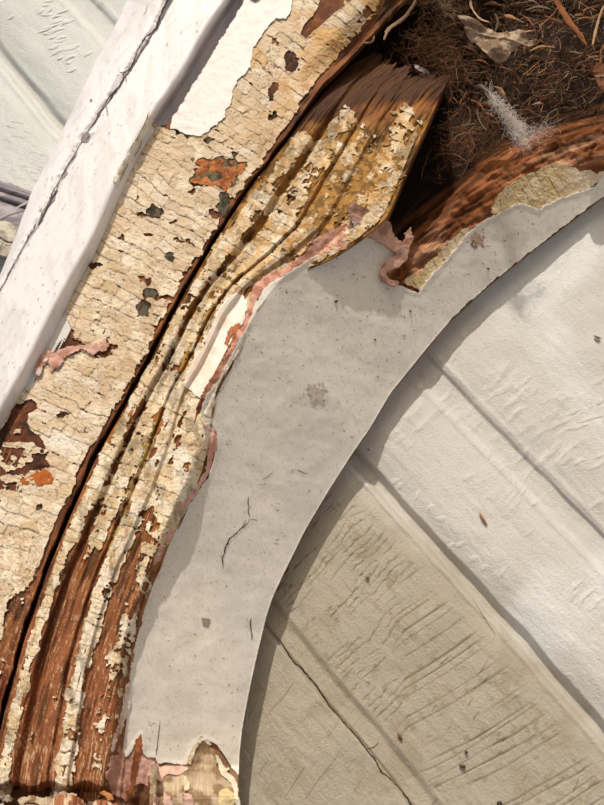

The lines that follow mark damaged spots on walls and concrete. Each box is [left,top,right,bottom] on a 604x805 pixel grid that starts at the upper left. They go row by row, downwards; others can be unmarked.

crack [0,0,208,396]
peeling [403,228,472,291]
peeling [491,162,604,214]
peeling [0,0,423,805]
crack [222,498,257,563]
crack [250,618,412,805]